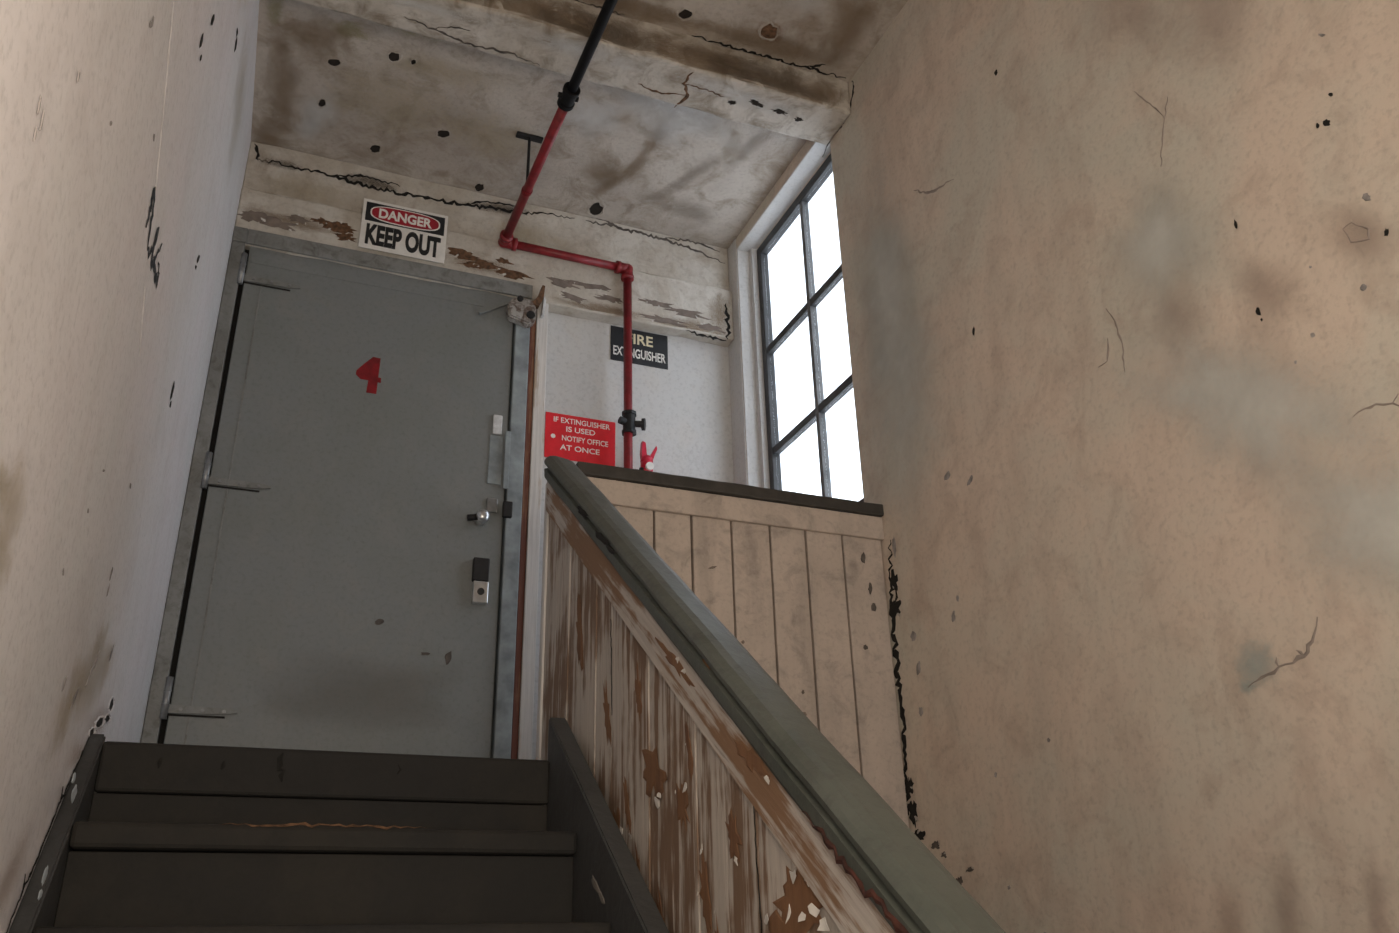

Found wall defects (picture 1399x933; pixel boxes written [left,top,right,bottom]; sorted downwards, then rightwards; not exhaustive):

water stain [246,0,848,235]
crack [254,143,723,263]
peeling [448,247,726,334]
flaking render [868,537,901,617]
peeling [655,637,695,687]
crack [1248,617,1318,688]
peeling [642,722,693,830]
peeling [697,845,719,933]
peeling [725,809,742,866]
peeling [764,866,830,933]
peeling [802,810,909,933]
flaking render [907,776,947,858]